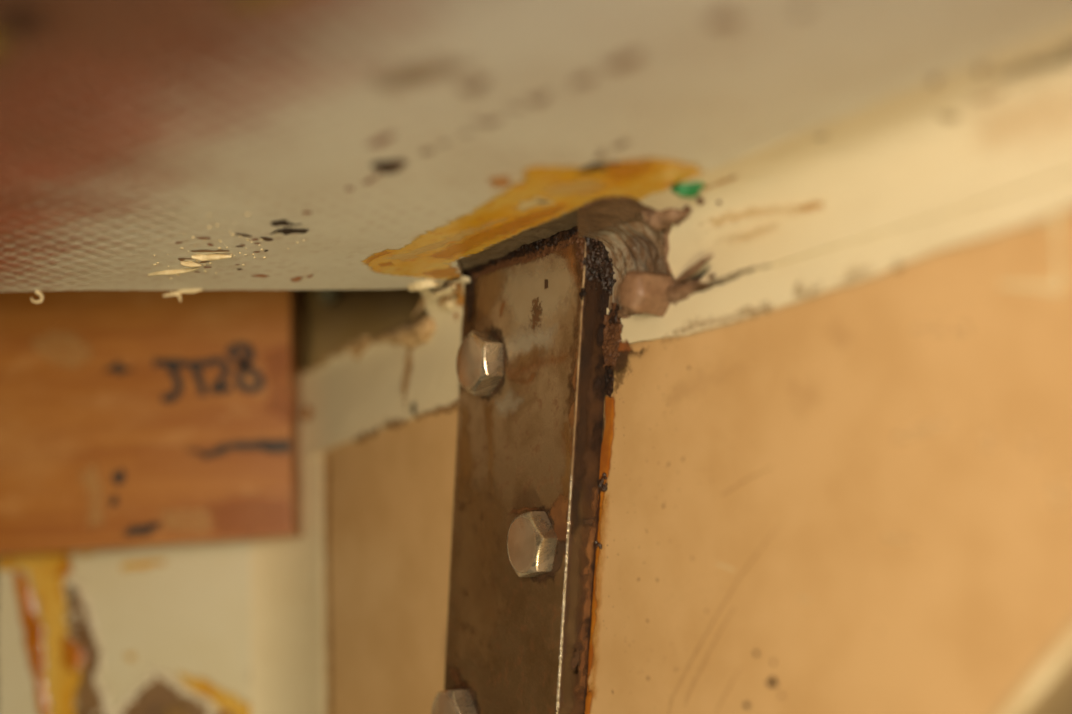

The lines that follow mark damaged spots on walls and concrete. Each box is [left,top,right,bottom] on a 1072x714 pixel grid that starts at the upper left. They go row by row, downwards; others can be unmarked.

spalling [346,160,406,191]
spalling [407,278,464,319]
peeling [673,254,714,284]
corrosion [355,400,472,500]
corrosion [461,226,644,714]
peeling [66,574,212,714]